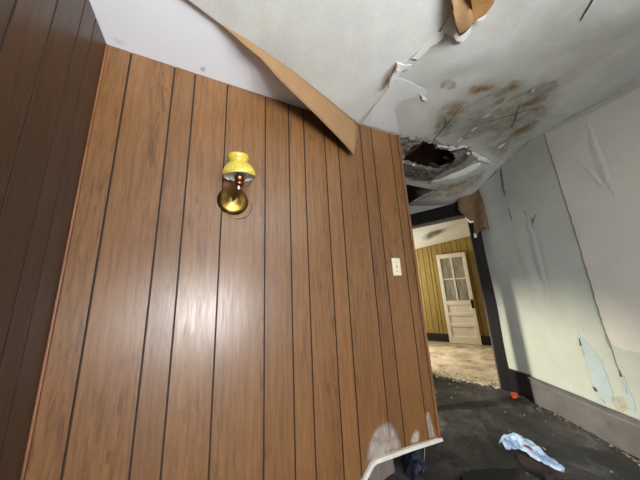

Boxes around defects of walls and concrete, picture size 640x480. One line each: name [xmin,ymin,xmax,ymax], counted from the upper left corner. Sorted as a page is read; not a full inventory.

crack [544,134,618,369]
peeling [578,335,613,404]